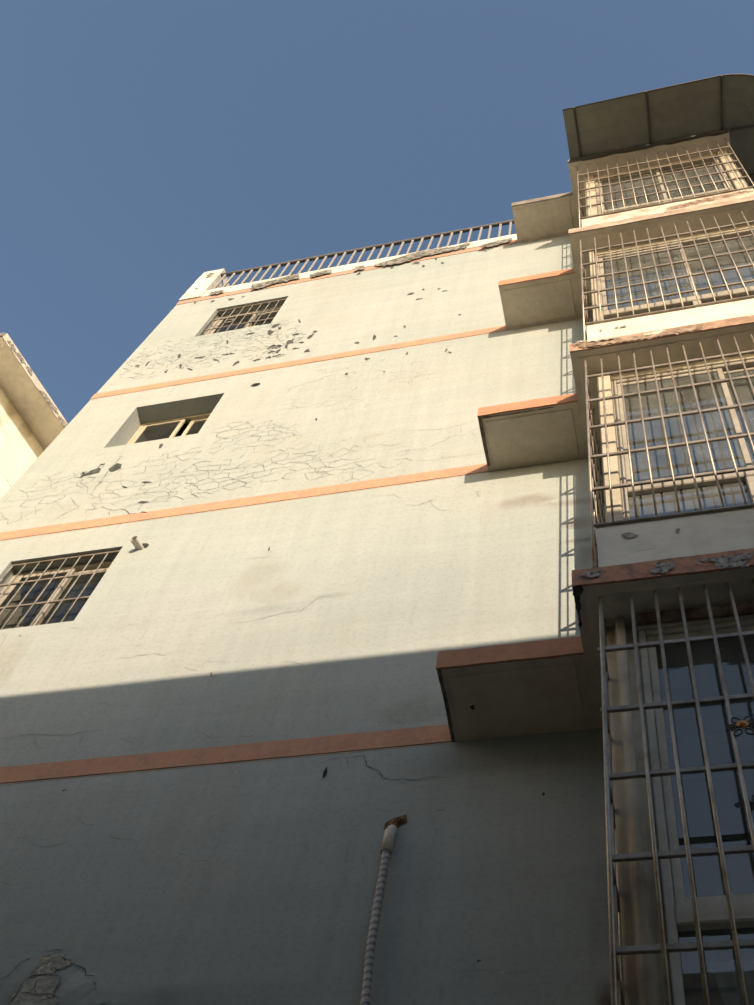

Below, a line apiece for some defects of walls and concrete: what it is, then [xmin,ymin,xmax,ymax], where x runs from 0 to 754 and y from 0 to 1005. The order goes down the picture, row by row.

peeling [252,319,317,361]
crack [2,358,476,523]
peeling [80,463,122,477]
peeling [695,550,754,570]
spalling [0,949,97,1005]